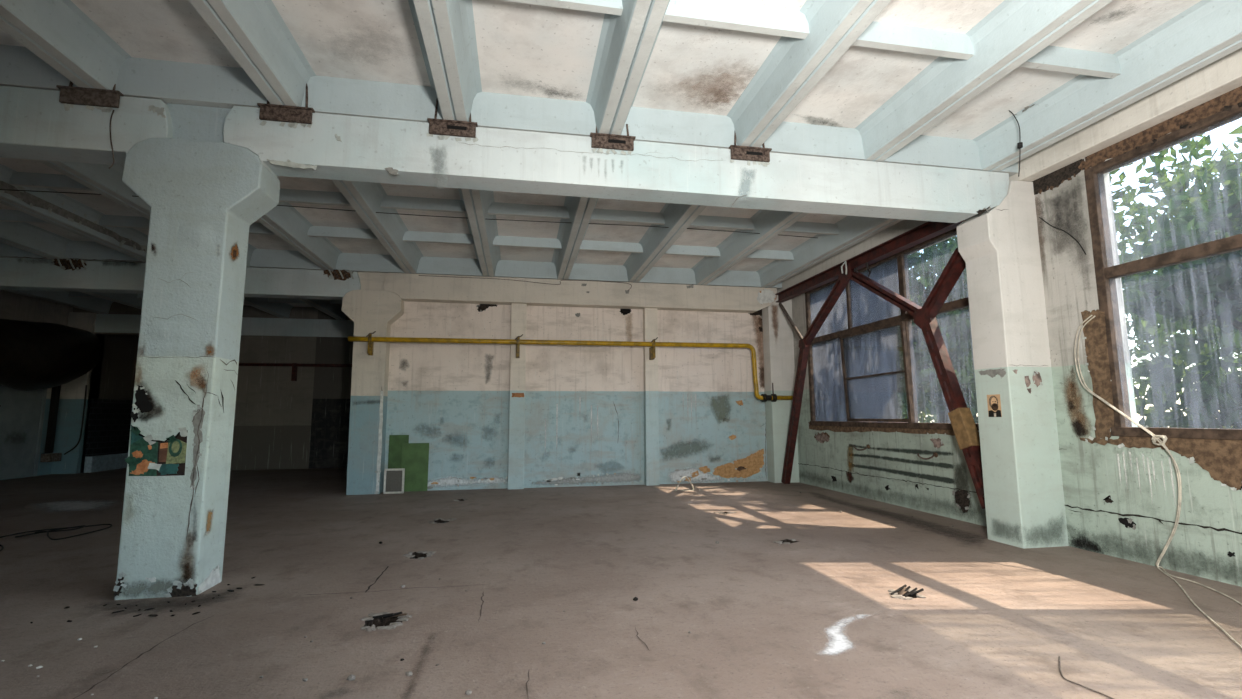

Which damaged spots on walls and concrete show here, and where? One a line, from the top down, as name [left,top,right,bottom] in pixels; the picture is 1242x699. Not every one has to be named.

damp [1053,190,1084,256]
spalling [131,385,153,422]
flaking render [1079,309,1242,491]
flaking render [808,422,955,450]
flaking render [670,448,766,483]
damp [994,522,1061,540]